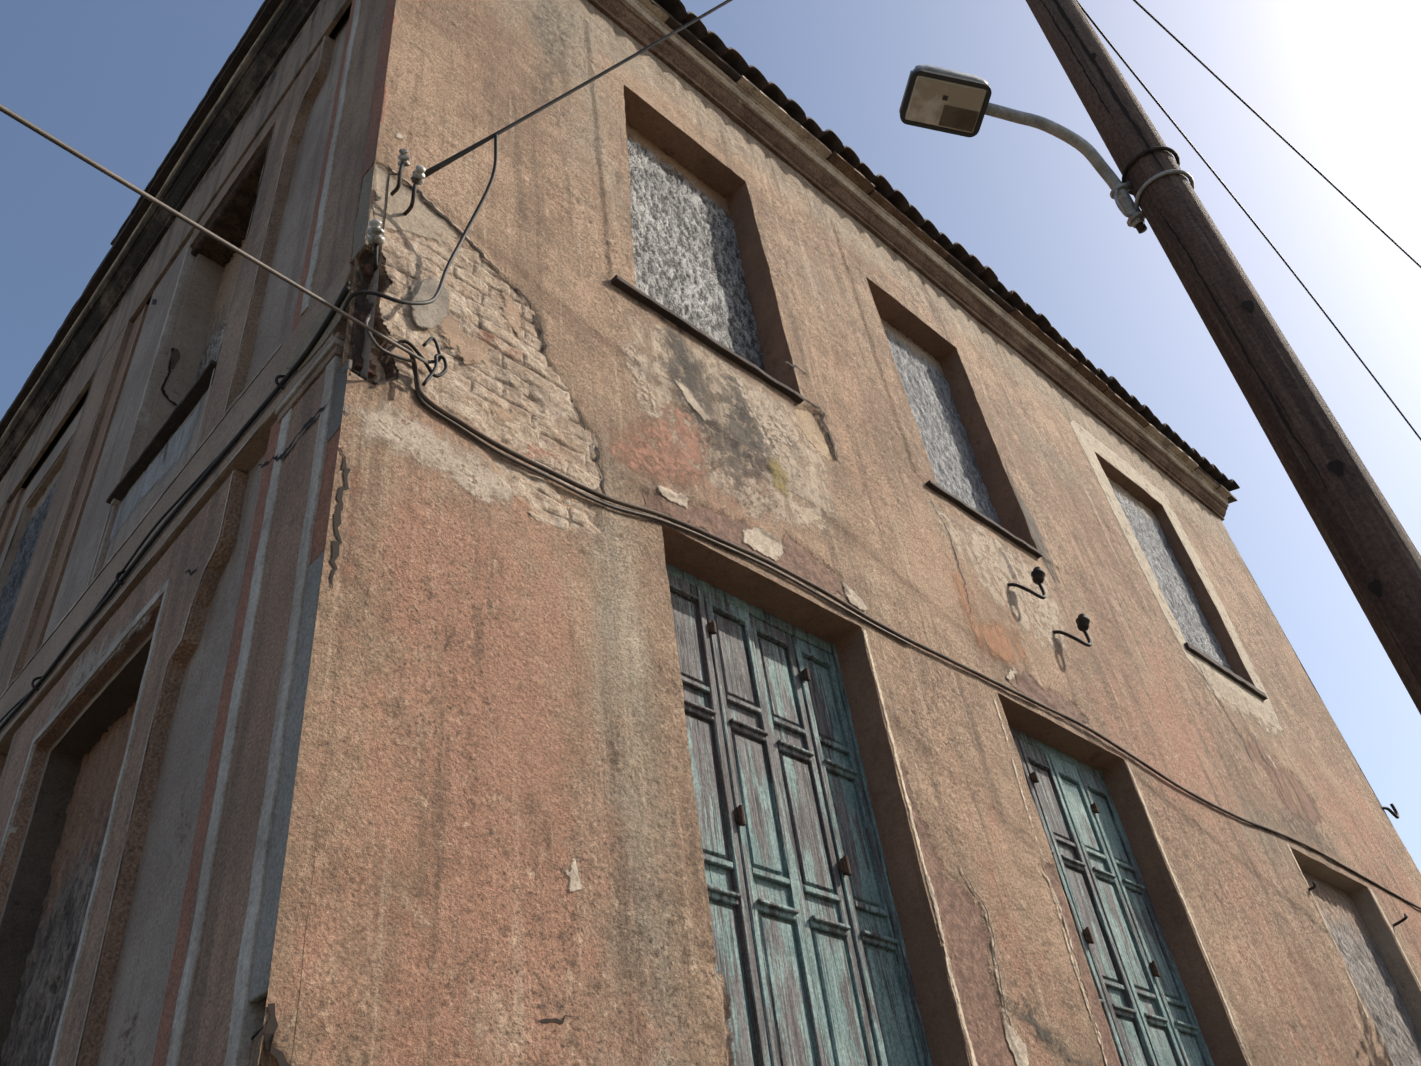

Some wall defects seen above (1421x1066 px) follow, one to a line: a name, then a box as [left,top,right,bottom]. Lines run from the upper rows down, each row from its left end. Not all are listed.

crack [161,348,180,406]
crack [330,447,363,590]
flaking render [349,164,867,611]
leakage [629,318,838,531]